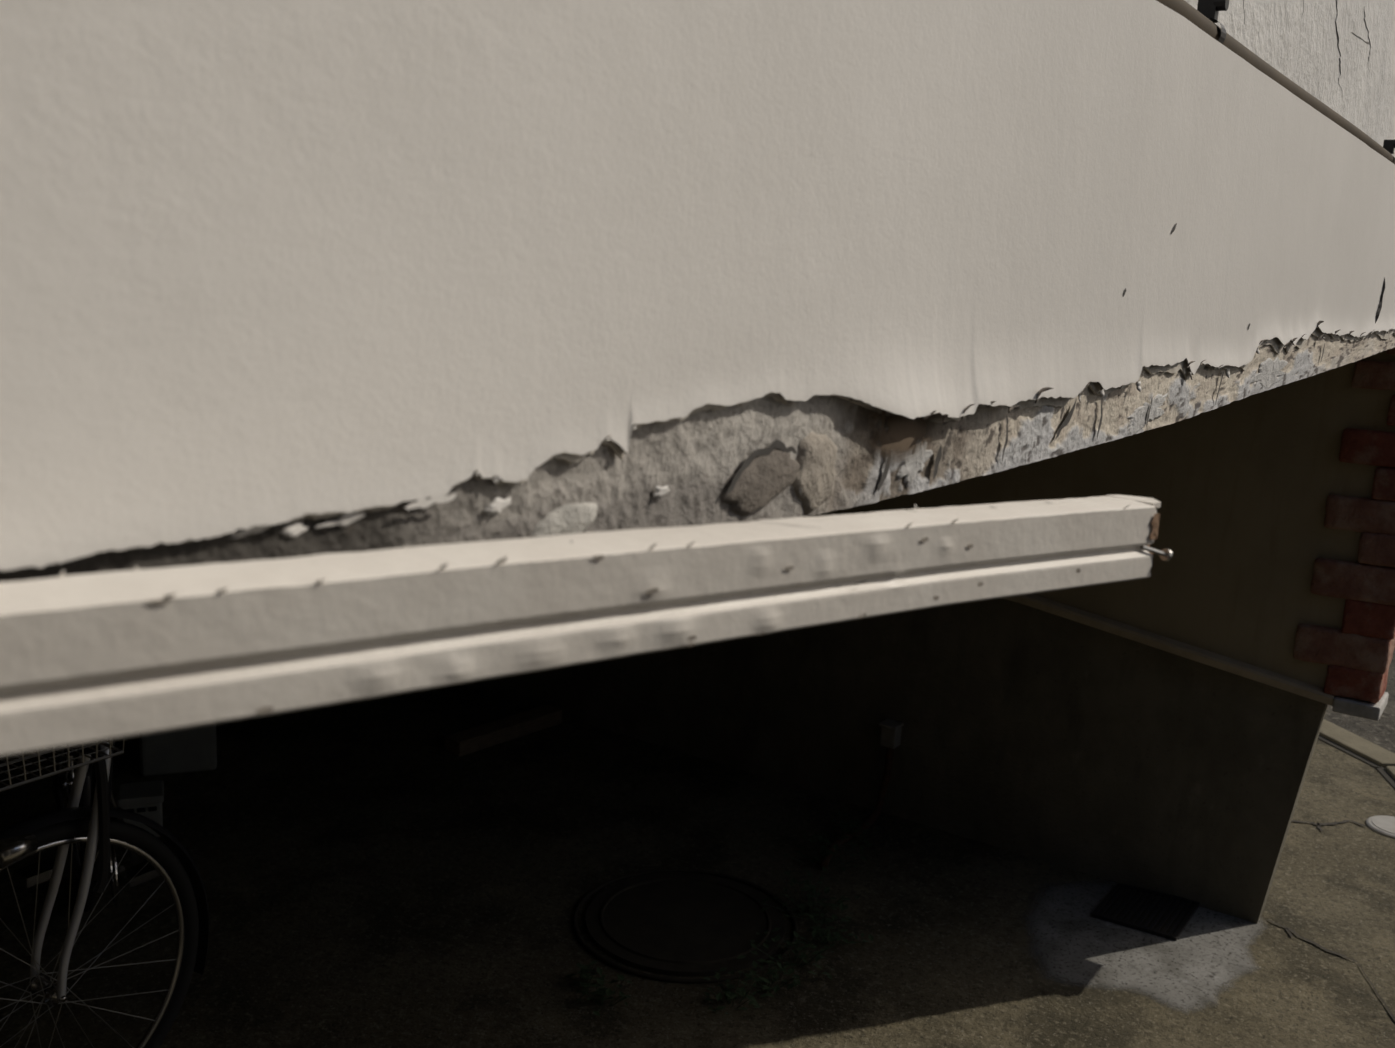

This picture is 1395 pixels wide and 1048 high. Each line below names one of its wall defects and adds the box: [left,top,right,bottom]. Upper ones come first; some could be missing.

crack [1302,0,1371,97]
crack [1375,277,1386,323]
peeling [0,321,1395,582]